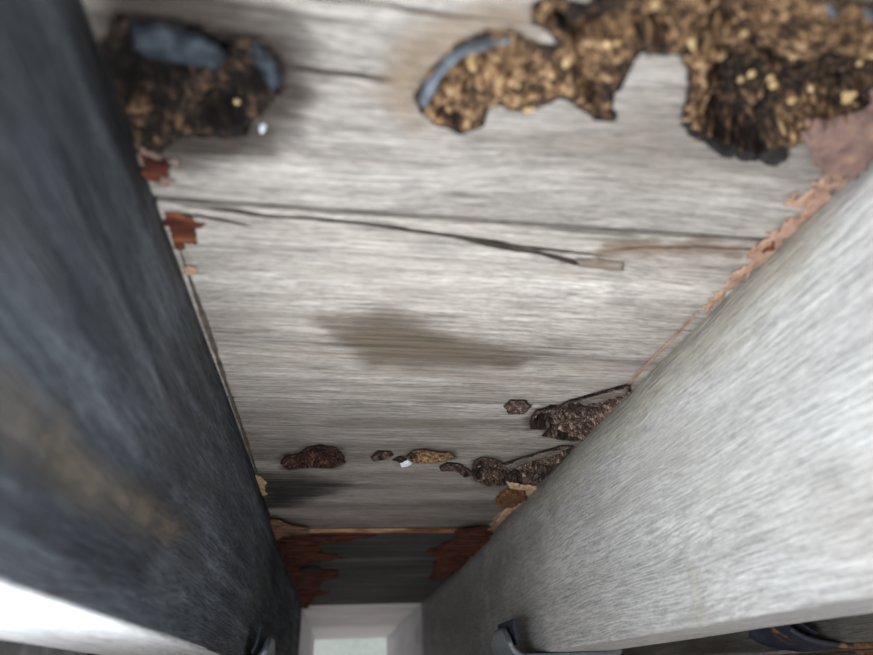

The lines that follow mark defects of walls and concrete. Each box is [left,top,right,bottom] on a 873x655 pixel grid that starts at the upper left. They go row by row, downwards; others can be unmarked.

spalling [130,23,227,69]
spalling [250,41,282,93]
spalling [418,38,513,108]
crack [161,202,750,272]
damp [324,310,528,367]